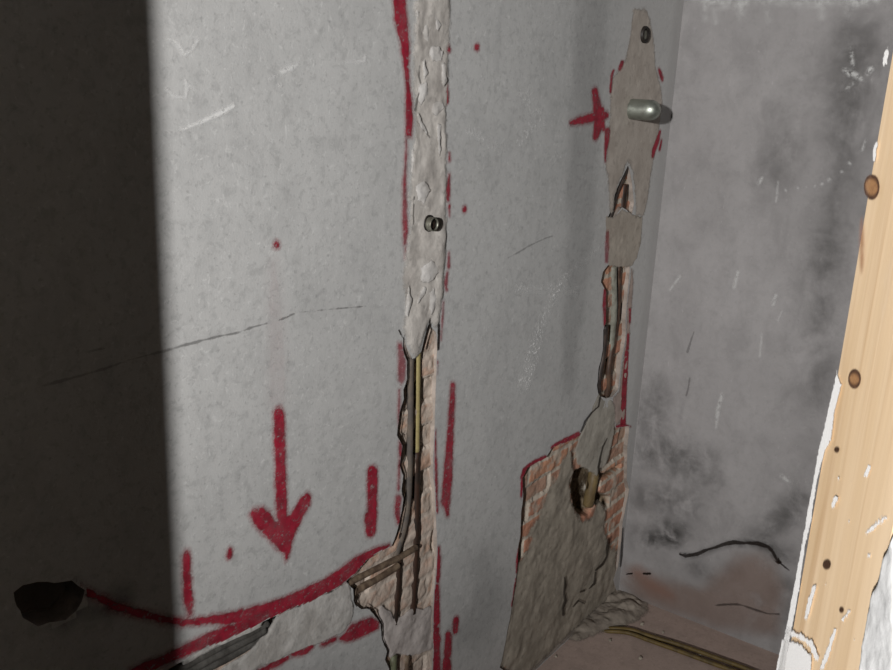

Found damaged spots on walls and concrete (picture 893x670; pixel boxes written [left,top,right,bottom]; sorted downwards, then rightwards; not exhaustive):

flaking render [599,265,630,398]
spalling [21,580,85,626]
flaking render [348,260,439,670]
flaking render [518,420,629,573]
crack [679,540,788,570]